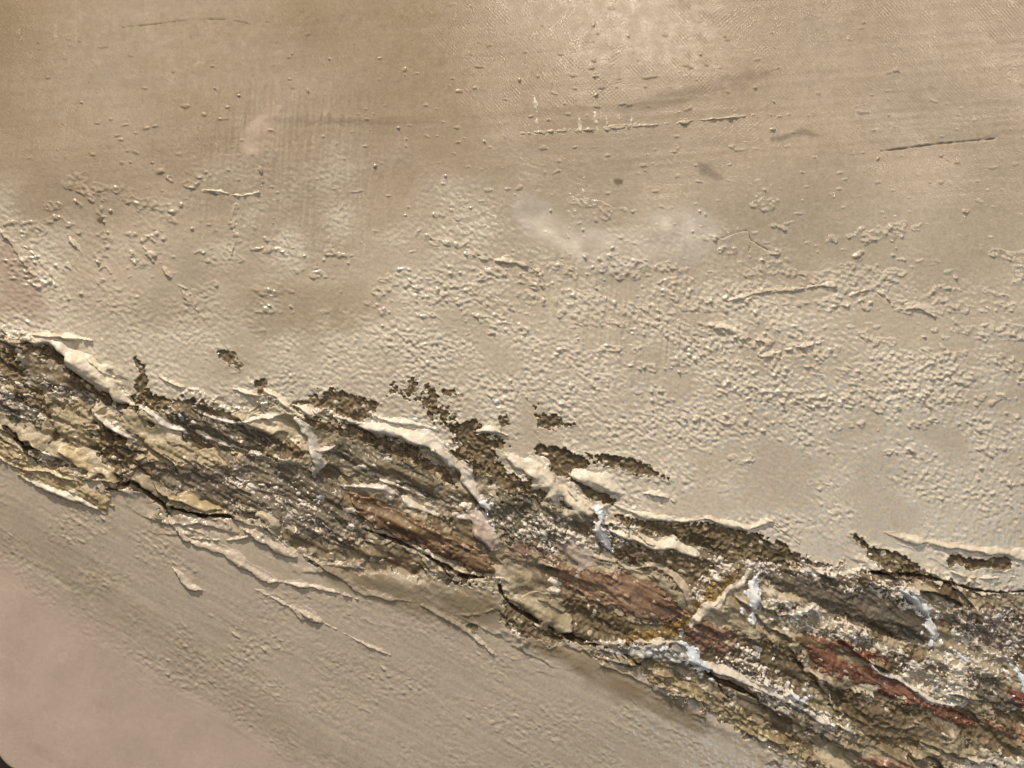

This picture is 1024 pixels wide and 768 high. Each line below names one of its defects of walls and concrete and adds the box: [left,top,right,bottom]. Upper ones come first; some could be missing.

crack [881,138,995,152]
spalling [0,332,1024,768]
corrosion [348,491,741,663]
corrosion [802,630,1024,741]